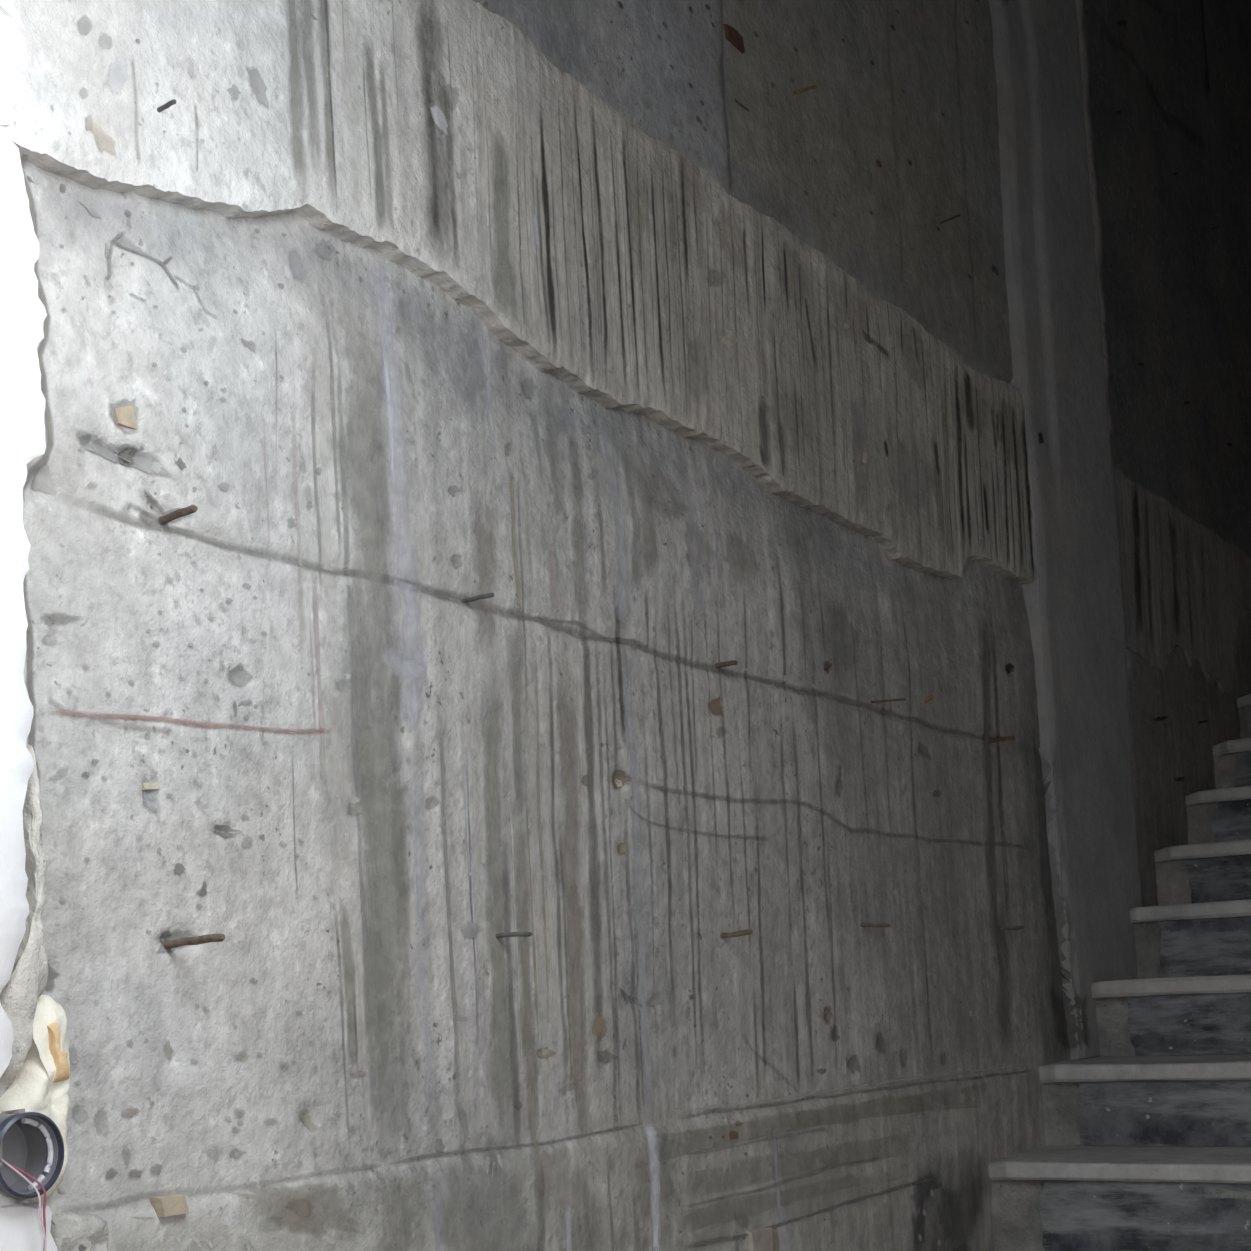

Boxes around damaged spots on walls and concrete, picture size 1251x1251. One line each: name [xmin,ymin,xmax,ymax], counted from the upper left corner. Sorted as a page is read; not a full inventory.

water stain [288,0,335,172]
water stain [421,15,457,246]
water stain [481,125,698,378]
water stain [312,287,420,598]
water stain [943,375,1034,568]
crack [51,700,325,733]
water stain [442,755,458,1070]
water stain [463,640,601,1240]
crack [105,496,991,739]
crack [653,786,1021,847]
crack [369,1126,628,1167]
crack [707,1065,1026,1113]